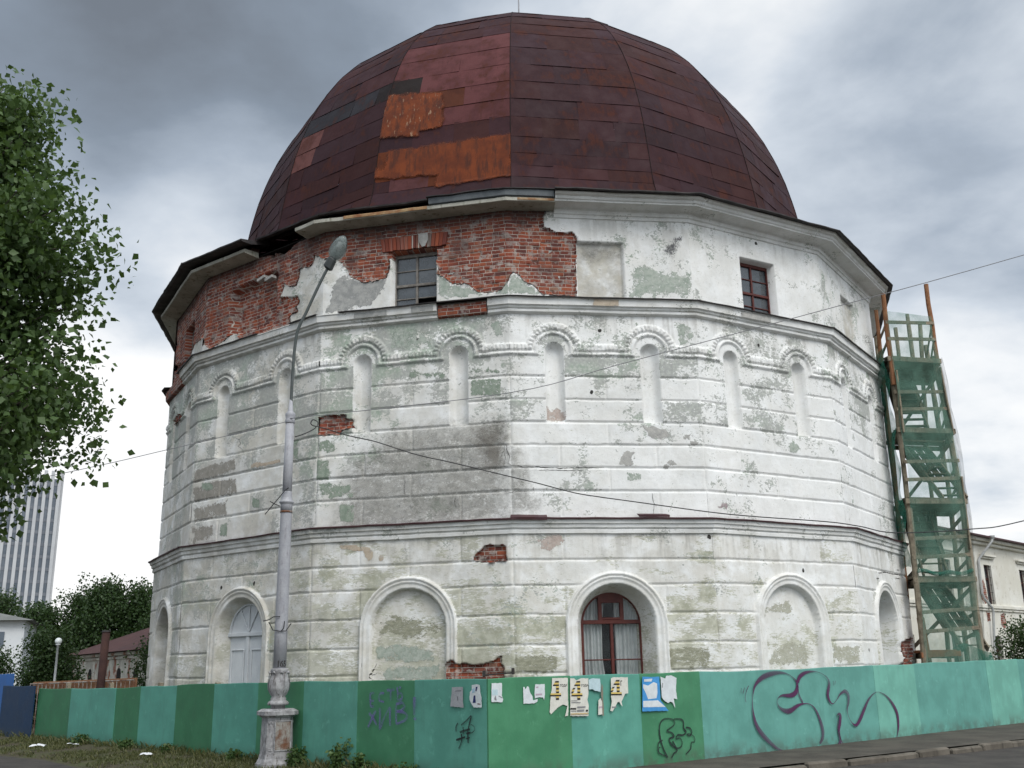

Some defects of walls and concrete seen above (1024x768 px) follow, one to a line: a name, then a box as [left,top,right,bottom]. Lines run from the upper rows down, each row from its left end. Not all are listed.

corrosion [374,92,511,187]
spalling [166,210,577,425]
peeling [593,264,692,306]
spalling [317,414,355,522]
spalling [474,544,507,563]
peeling [376,615,558,680]
spalling [898,638,913,665]